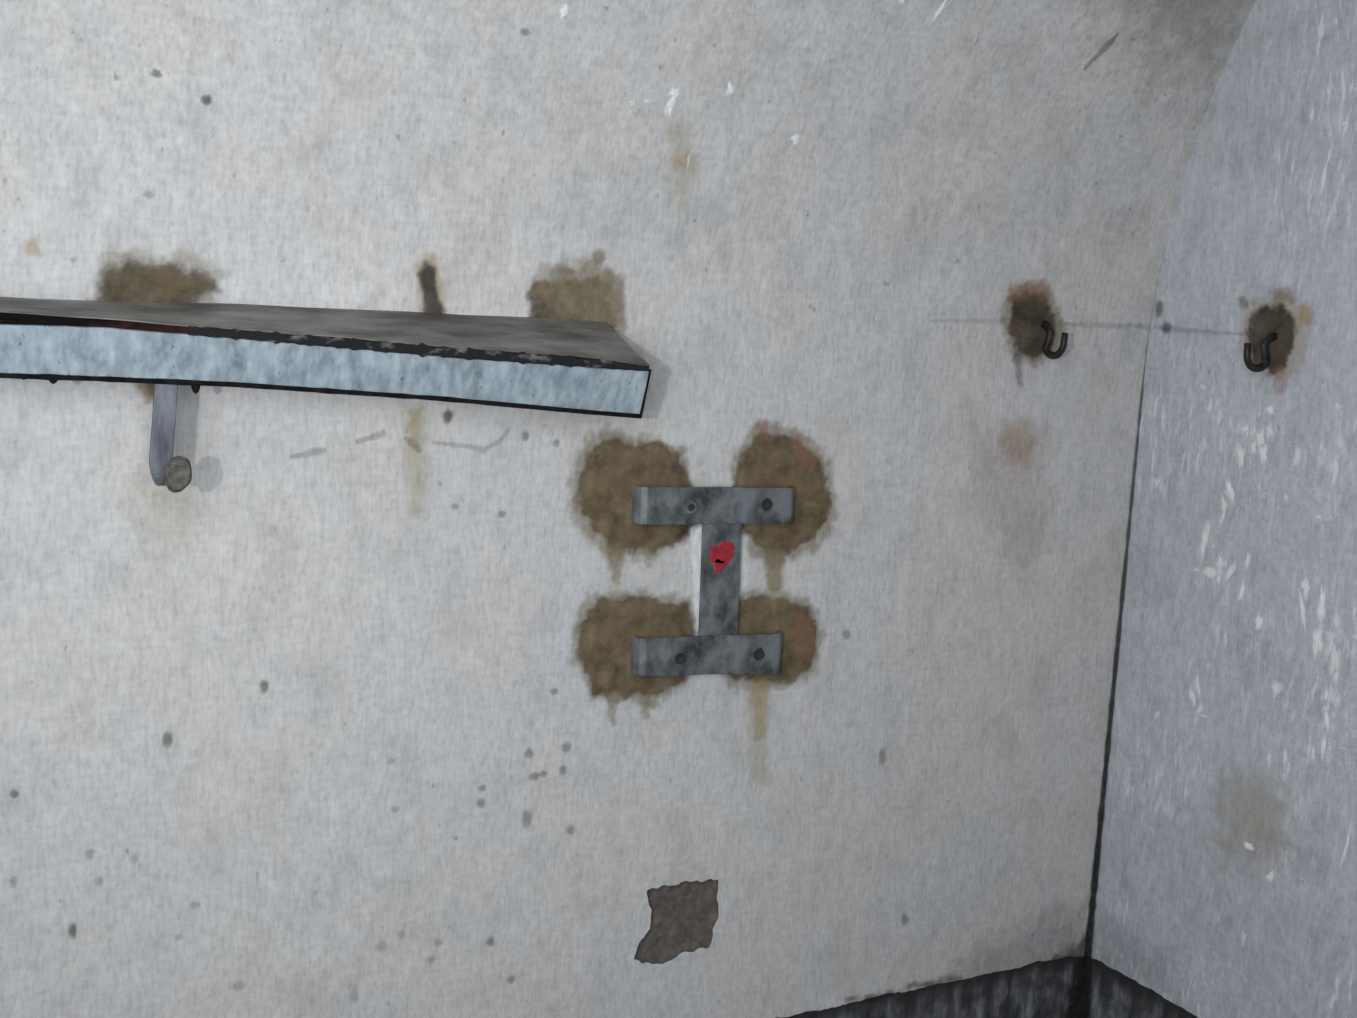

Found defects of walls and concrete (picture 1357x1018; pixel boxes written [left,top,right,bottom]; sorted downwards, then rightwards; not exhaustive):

rust [419,265,443,314]
spalling [634,879,719,964]